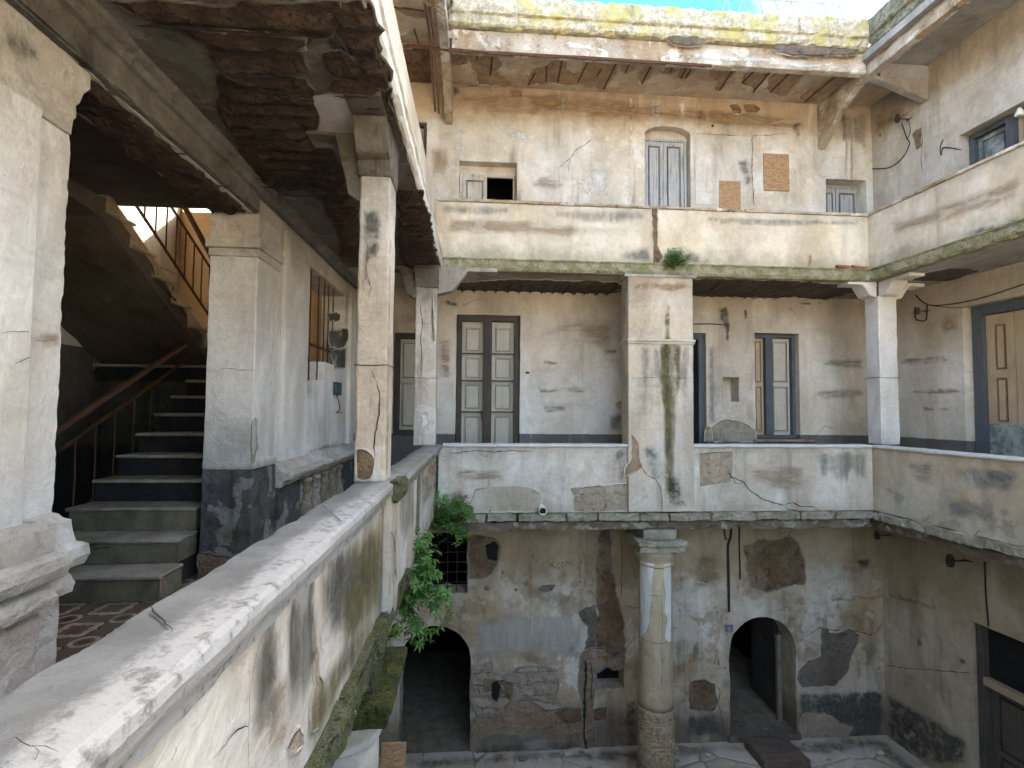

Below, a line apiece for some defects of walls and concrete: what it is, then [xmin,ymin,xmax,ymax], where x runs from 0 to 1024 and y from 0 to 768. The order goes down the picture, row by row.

crack [371,370,380,459]
damp [646,344,685,459]
spalling [354,447,377,482]
spalling [571,435,643,513]
crack [728,473,820,538]
spalling [742,535,807,593]
damp [259,543,379,739]
spalling [467,529,626,748]
spalling [796,628,861,688]
spalling [688,679,718,712]
damp [801,692,964,762]